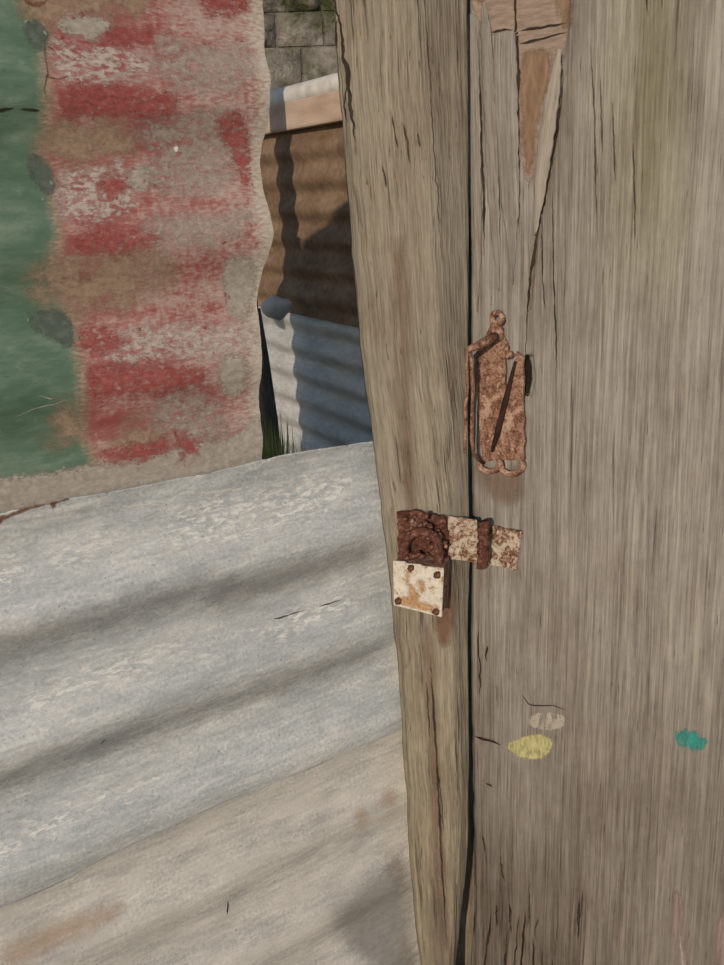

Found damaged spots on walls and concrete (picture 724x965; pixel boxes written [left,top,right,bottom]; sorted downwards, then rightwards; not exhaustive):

peeling [198,0,248,18]
peeling [23,12,255,201]
crack [478,68,486,247]
crack [492,0,566,367]
crack [591,55,636,231]
peeling [27,310,252,465]
rust [410,512,448,556]
rust [436,580,453,644]